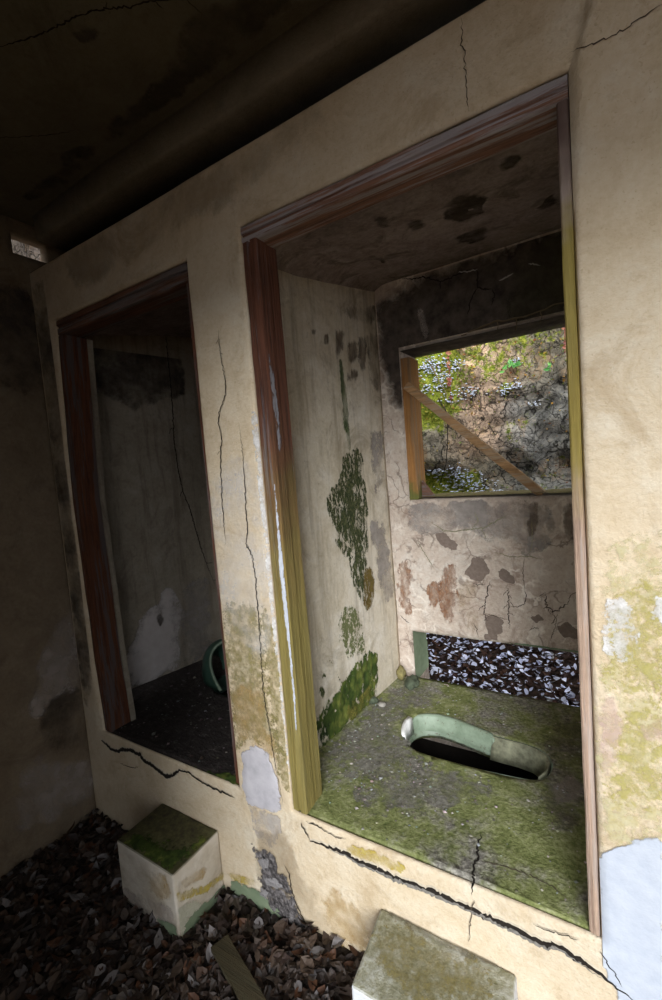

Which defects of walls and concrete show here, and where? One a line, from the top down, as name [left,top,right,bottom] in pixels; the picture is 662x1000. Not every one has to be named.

damp [444,196,487,222]
damp [93,348,185,409]
crack [166,332,283,801]
damp [370,521,391,602]
spalling [465,557,515,584]
crack [418,514,576,640]
spalling [484,615,504,640]
damp [260,605,290,793]
crack [101,739,234,798]
spalling [157,843,305,937]
crack [301,821,632,1000]
flaking render [599,838,662,1000]